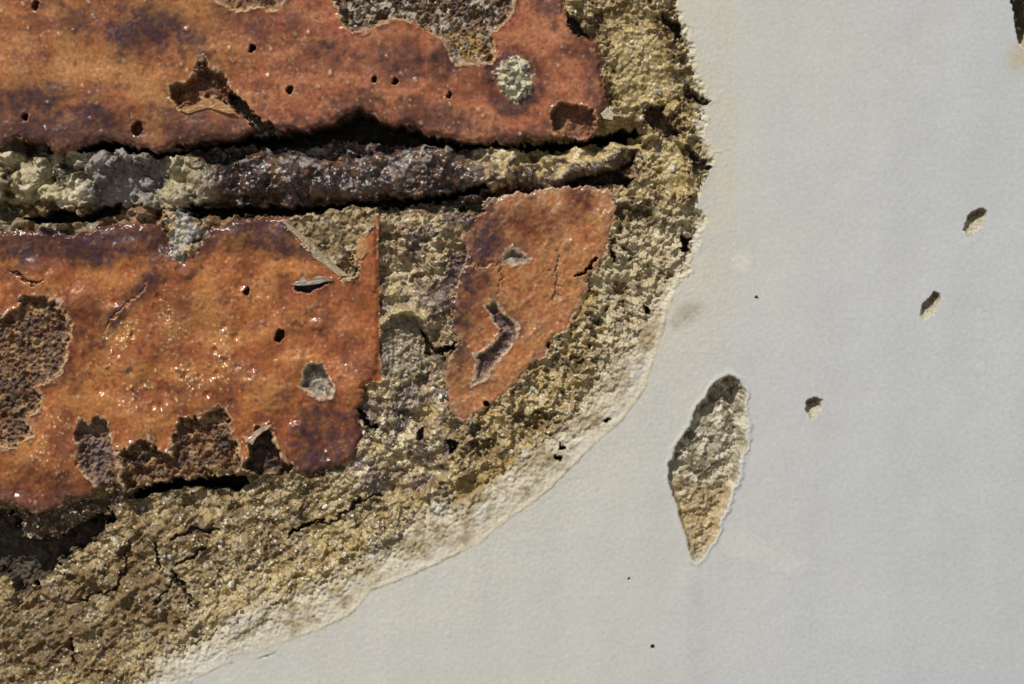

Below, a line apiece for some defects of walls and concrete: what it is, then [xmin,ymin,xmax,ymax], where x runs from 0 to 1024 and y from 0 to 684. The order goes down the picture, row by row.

hole [1009,0,1024,51]
crack [77,94,645,190]
crack [24,202,126,226]
crack [188,183,490,222]
flaking render [961,206,990,239]
flaking render [918,289,943,322]
flaking render [0,0,722,684]
flaking render [803,394,826,422]
flaking render [665,373,752,566]
crack [287,492,383,540]
crack [0,474,251,608]
crack [68,636,78,672]